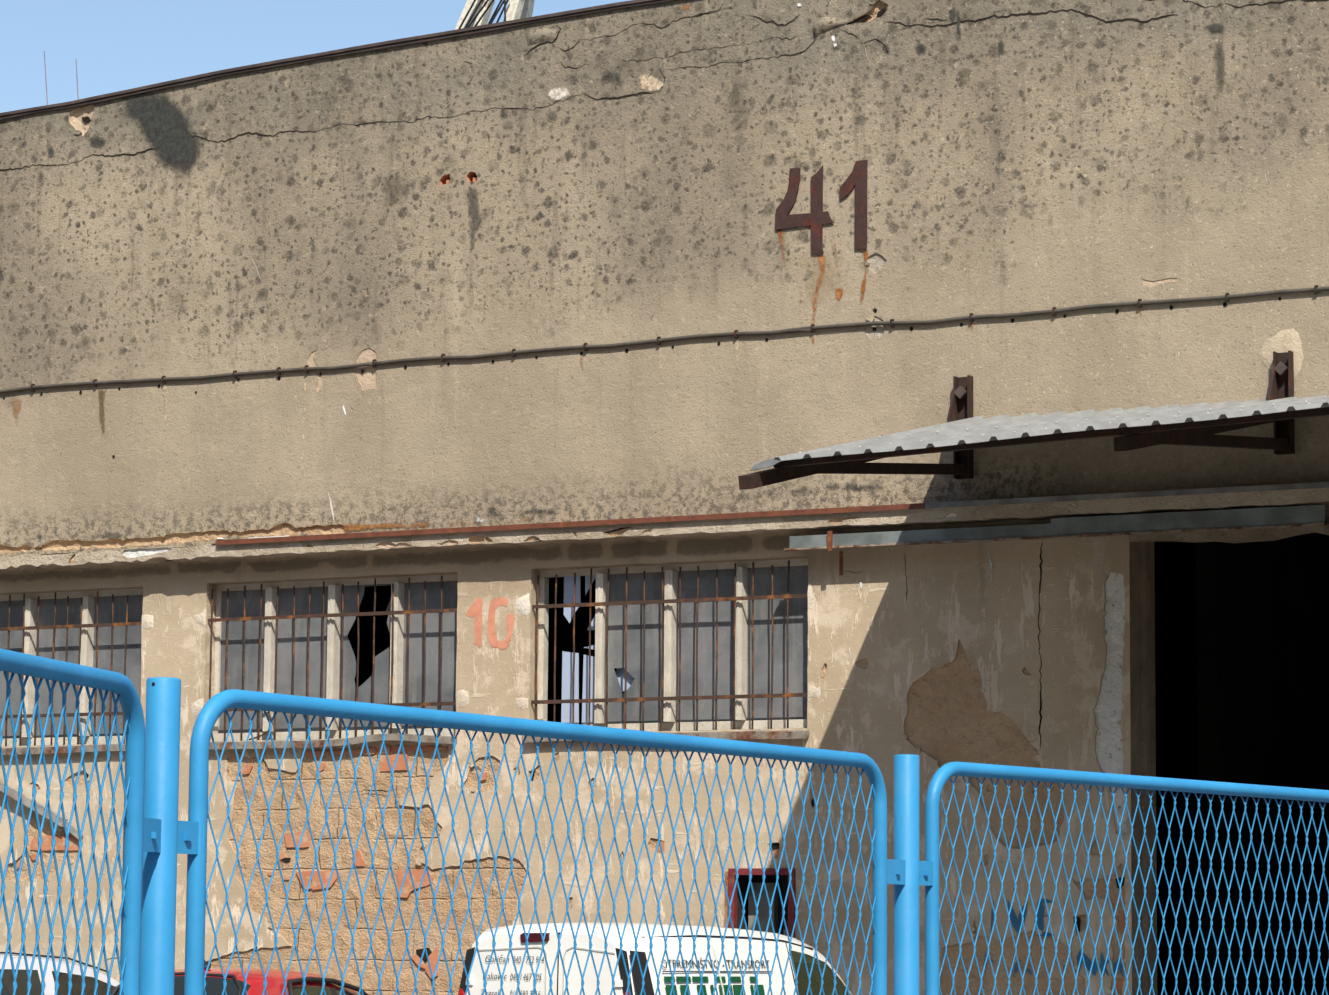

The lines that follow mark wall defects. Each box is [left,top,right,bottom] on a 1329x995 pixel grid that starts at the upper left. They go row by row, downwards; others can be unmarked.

crack [888,0,1328,30]
crack [194,4,858,143]
crack [0,148,157,171]
flaking render [69,105,95,136]
water stain [127,96,199,169]
rust [813,255,825,318]
flaking render [352,348,377,390]
flaking render [0,522,349,563]
crack [1028,543,1043,754]
flaking render [464,755,539,792]
flaking render [901,640,1065,849]
flaking render [205,744,527,995]